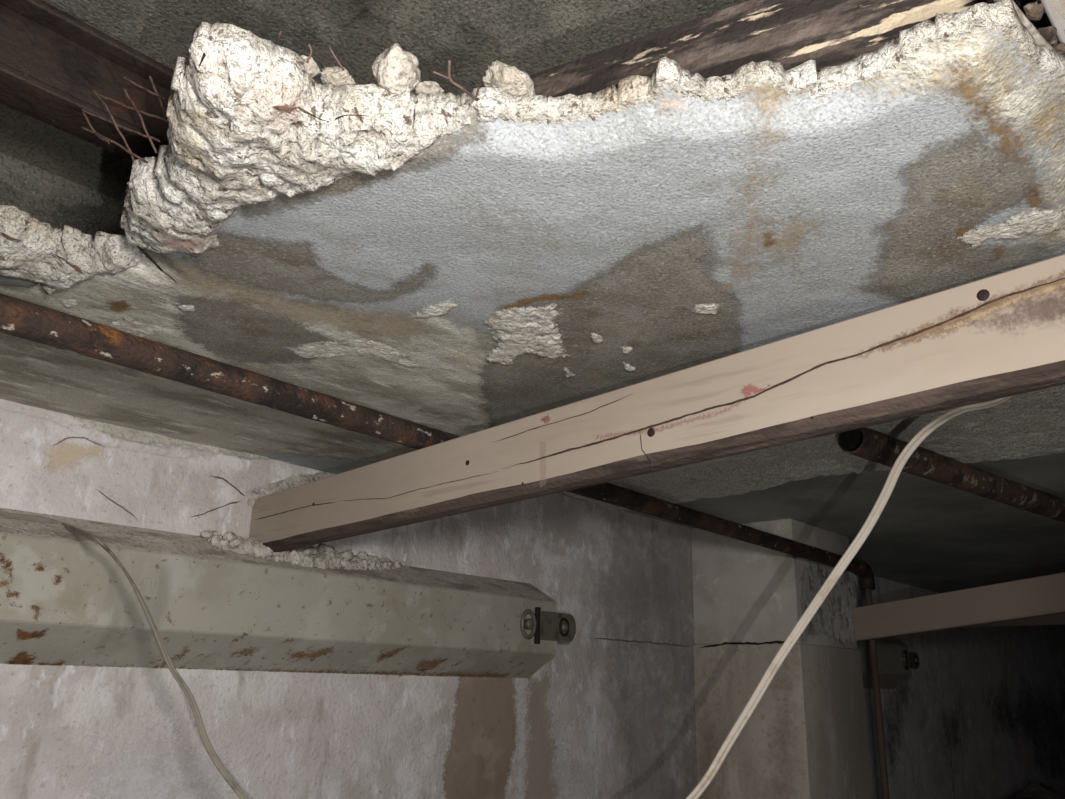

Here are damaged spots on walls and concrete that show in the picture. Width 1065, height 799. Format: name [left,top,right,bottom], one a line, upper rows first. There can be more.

flaking render [0,42,510,308]
leakage [862,27,1065,302]
peeling [958,207,1065,249]
leakage [0,225,747,437]
peeling [691,303,720,314]
leakage [882,272,1065,350]
leakage [0,332,418,463]
crack [192,278,1065,520]
corrosion [0,552,21,598]
corrosion [5,605,67,666]
corrosion [214,629,523,678]
crack [594,638,785,648]